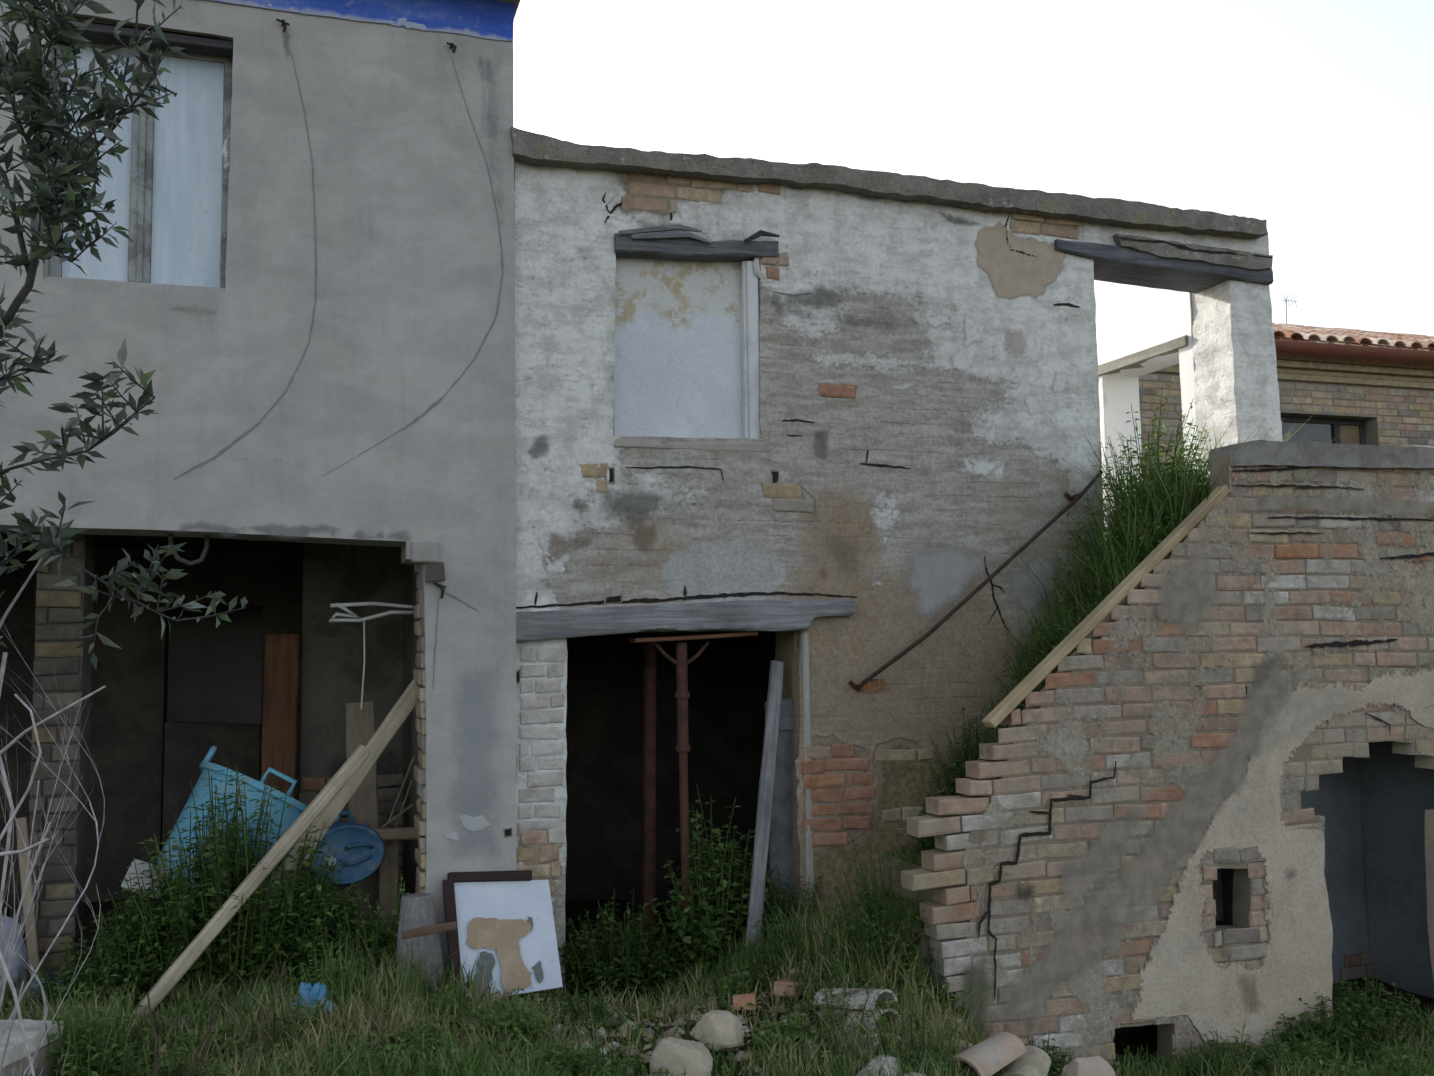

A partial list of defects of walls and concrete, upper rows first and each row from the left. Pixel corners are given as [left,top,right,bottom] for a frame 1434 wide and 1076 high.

crack [174,31,317,479]
crack [323,57,504,476]
spalling [599,171,783,226]
spalling [975,213,1089,299]
spalling [795,729,947,854]
crack [978,761,1116,1000]